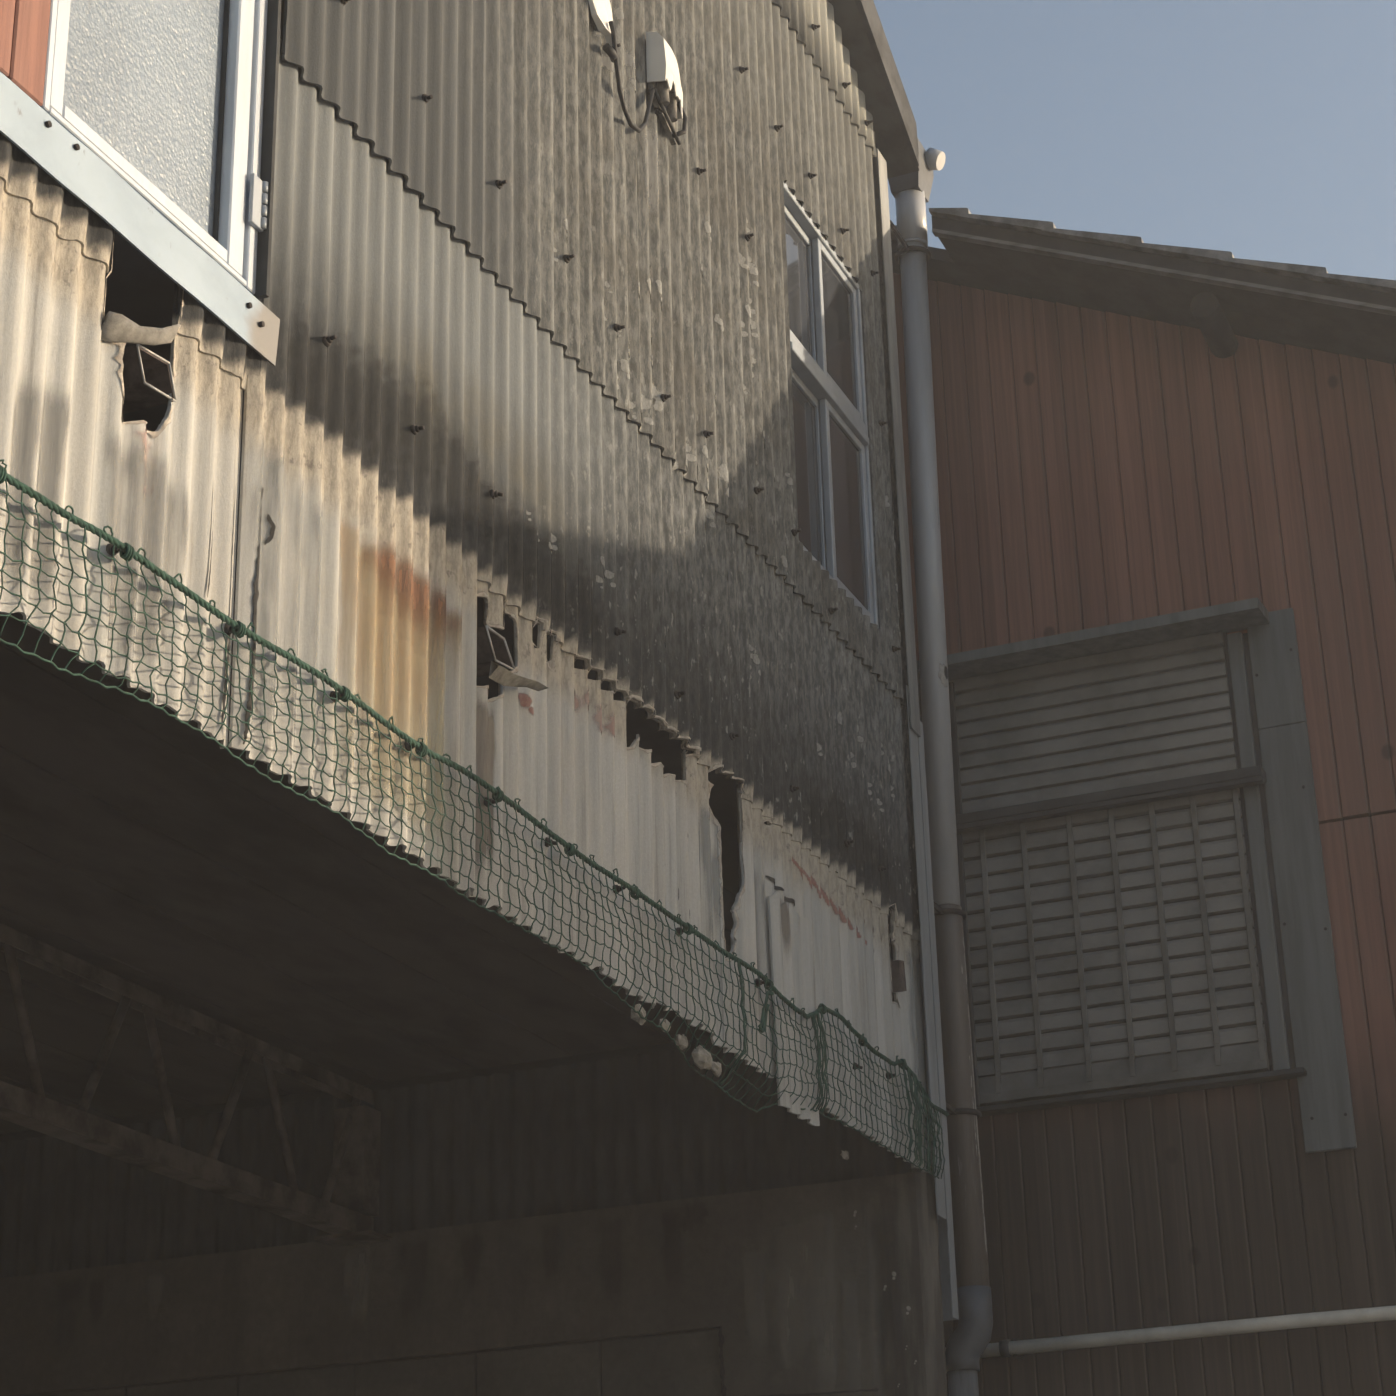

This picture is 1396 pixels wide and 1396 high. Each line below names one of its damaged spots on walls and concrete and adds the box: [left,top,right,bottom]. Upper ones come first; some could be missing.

spalling [107,341,126,404]
spalling [123,402,173,438]
damp [5,393,70,579]
damp [109,432,189,645]
rust [378,549,446,624]
spalling [477,591,519,645]
spalling [626,694,745,962]